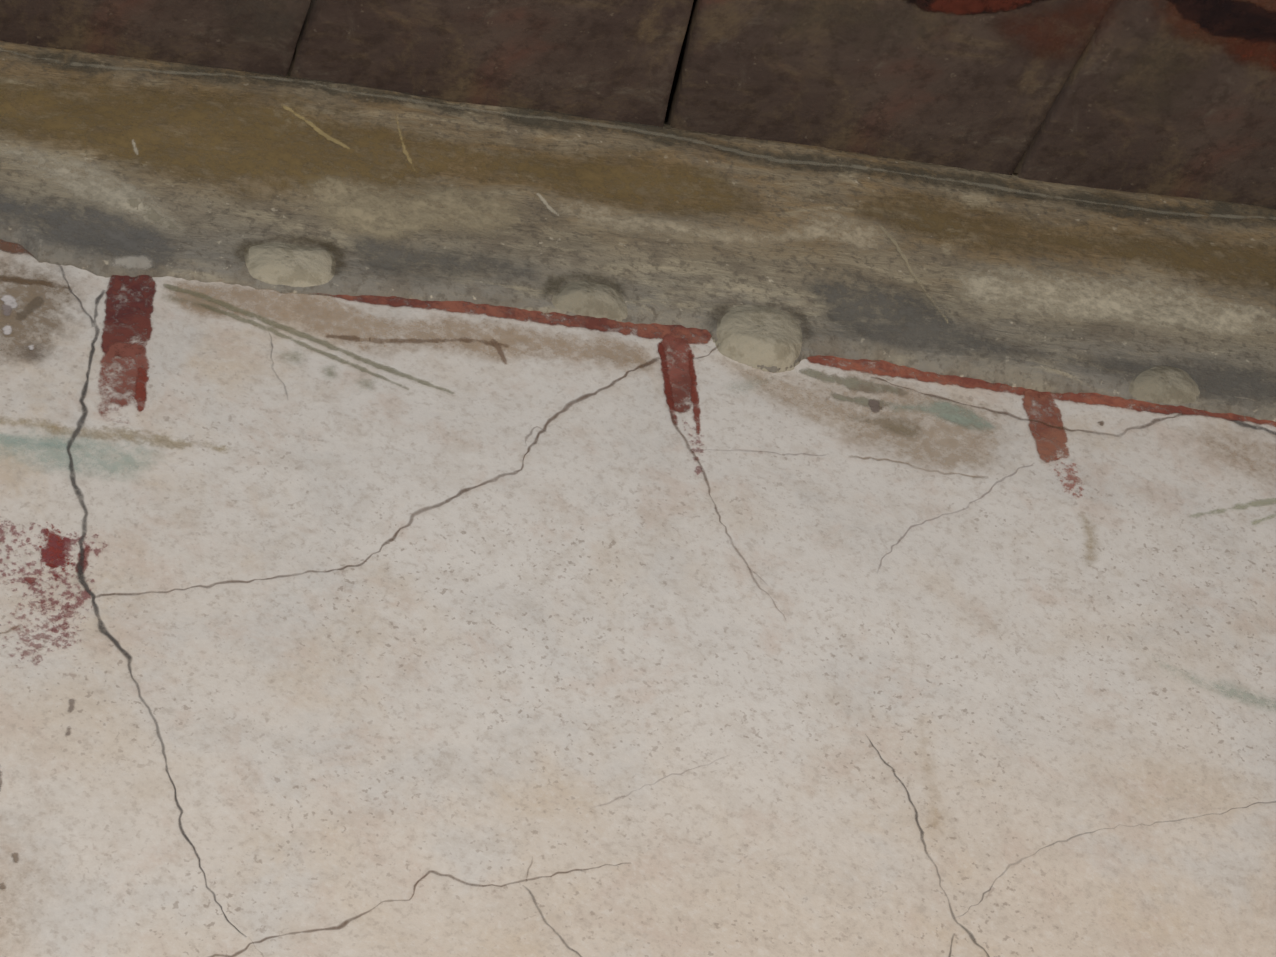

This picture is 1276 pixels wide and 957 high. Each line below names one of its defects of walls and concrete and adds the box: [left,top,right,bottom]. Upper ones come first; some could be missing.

water stain [0,52,1276,285]
water stain [0,262,69,357]
water stain [175,283,646,368]
water stain [813,283,1005,351]
water stain [961,270,1276,335]
crack [517,359,656,472]
water stain [785,385,992,467]
crack [65,279,282,676]
crack [436,482,487,506]
crack [325,525,408,572]
crack [869,739,923,834]
crack [162,743,277,957]